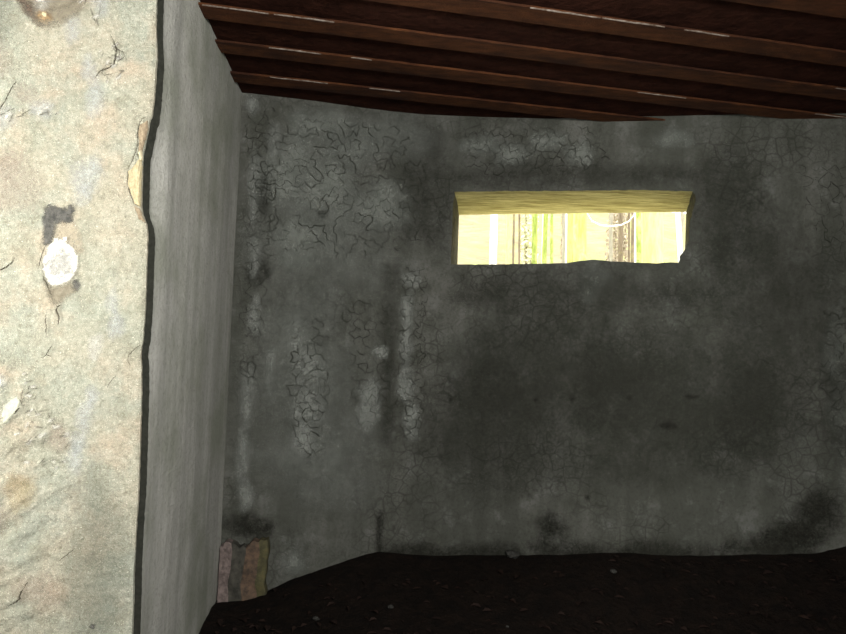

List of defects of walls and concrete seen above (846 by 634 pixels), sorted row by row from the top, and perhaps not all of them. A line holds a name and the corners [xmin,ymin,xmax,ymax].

crack [96,34,127,76]
spalling [128,121,149,222]
crack [462,126,608,177]
damp [42,222,80,305]
crack [240,107,429,458]